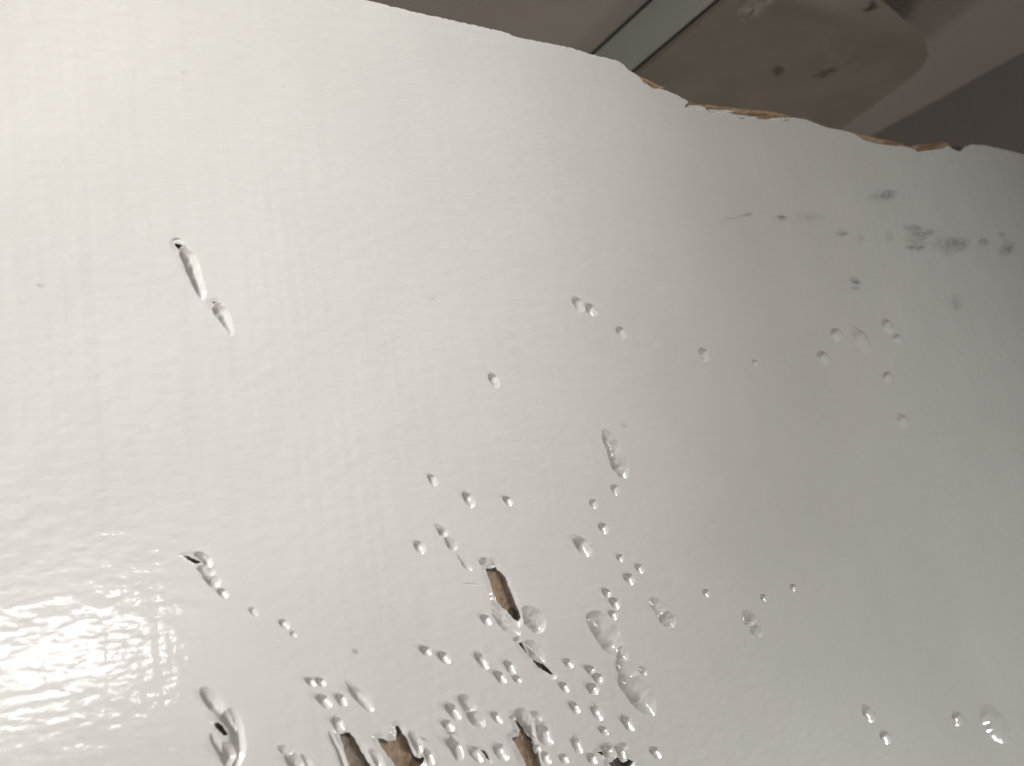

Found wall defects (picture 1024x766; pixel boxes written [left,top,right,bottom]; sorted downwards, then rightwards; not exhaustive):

peeling [462,557,558,680]
peeling [328,719,428,766]
peeling [506,707,545,766]
peeling [593,742,637,766]